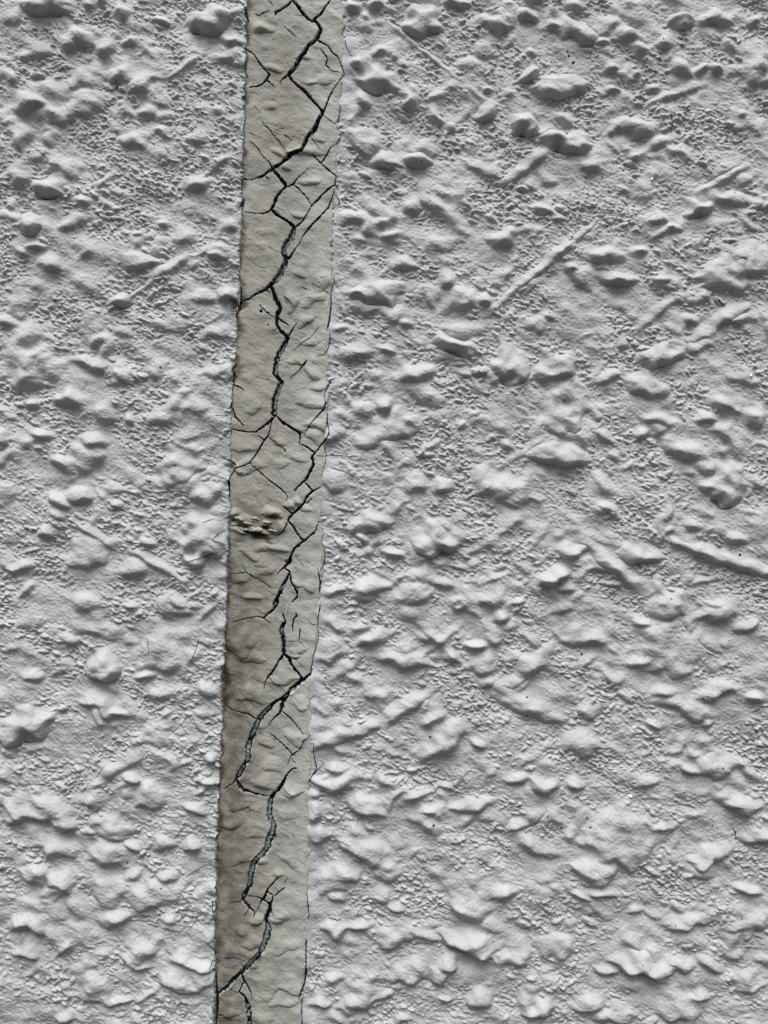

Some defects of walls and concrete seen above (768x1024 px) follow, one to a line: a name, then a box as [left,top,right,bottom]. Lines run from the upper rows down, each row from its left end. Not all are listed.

crack [186,0,353,1024]